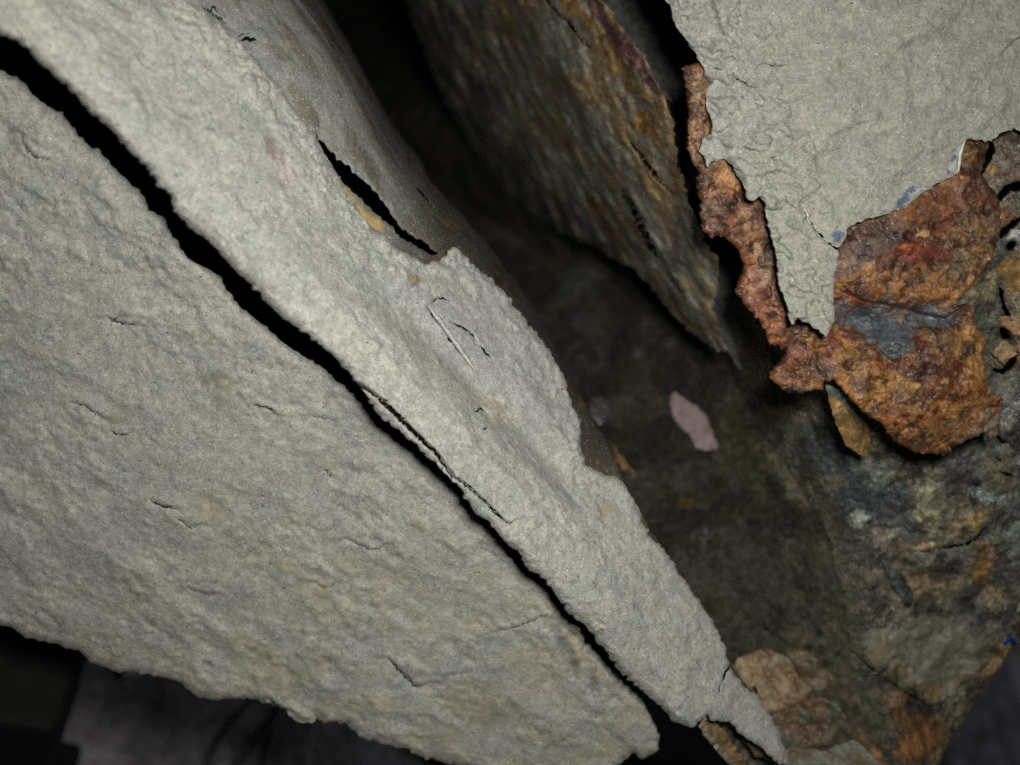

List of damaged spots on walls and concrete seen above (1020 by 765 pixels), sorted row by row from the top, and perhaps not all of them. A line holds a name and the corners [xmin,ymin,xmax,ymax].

crack [202,5,256,42]
crack [546,0,591,49]
corrosion [560,0,671,146]
peeling [947,140,965,176]
peeling [880,186,928,215]
corrosion [681,62,1020,459]
crack [0,35,643,697]
peeling [426,304,478,374]
corrosion [608,440,636,478]
corrosion [732,647,846,749]
corrosion [858,709,942,765]